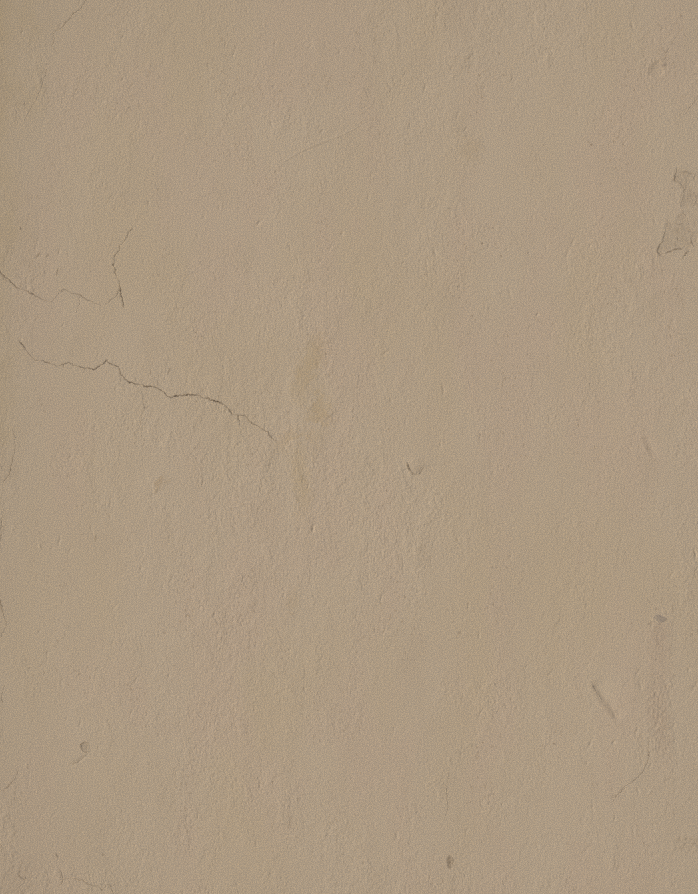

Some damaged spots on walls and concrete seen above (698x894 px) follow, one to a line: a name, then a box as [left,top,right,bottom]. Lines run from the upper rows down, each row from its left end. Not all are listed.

crack [0,228,133,313]
crack [19,341,278,442]